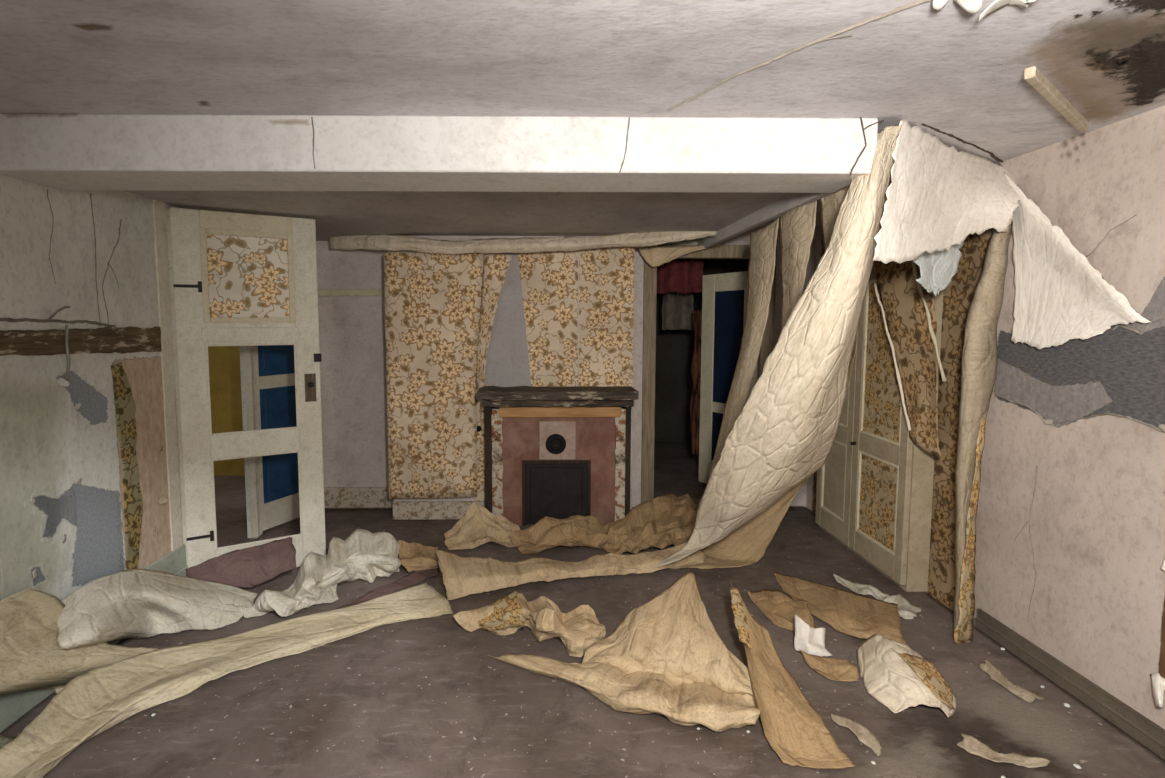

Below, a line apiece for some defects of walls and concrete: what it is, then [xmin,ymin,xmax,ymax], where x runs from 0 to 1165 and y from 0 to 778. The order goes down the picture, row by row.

crack [667,0,931,111]
spalling [933,0,1036,23]
crack [618,117,630,175]
peeling [484,253,531,387]
peeling [696,185,849,512]
flaking render [873,120,1165,643]
peeling [30,356,183,586]